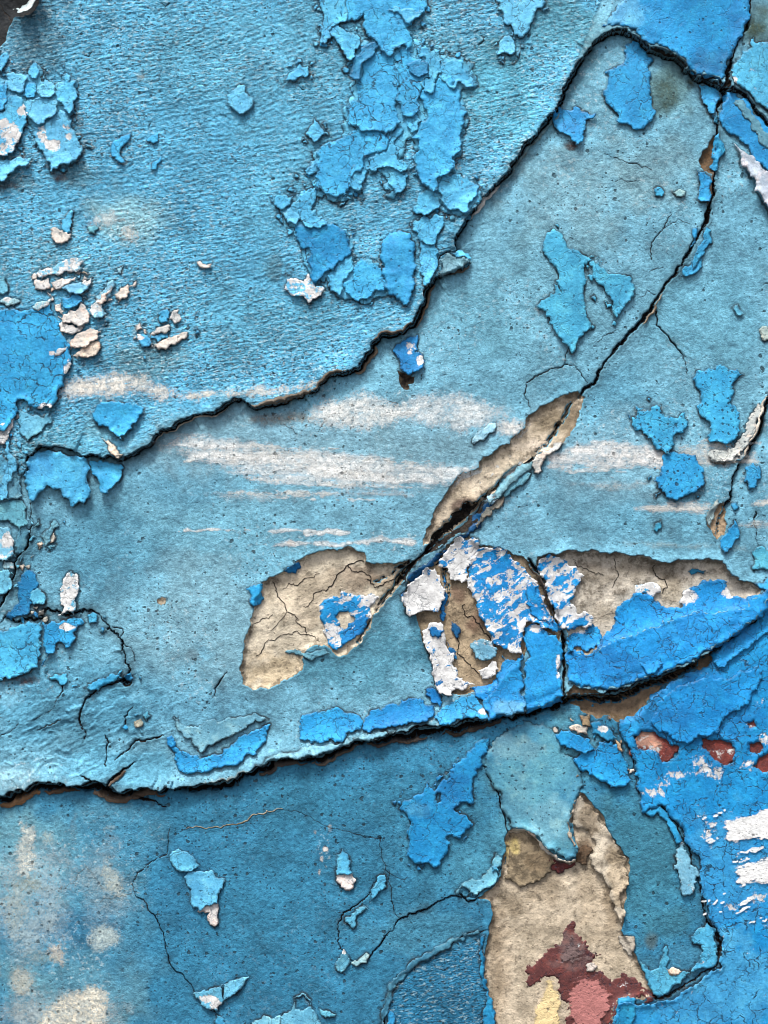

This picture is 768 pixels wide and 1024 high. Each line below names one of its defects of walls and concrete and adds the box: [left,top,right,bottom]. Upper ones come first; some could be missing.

peeling [0,0,92,182]
peeling [50,210,73,243]
peeling [110,133,131,163]
peeling [270,0,482,306]
peeling [133,309,200,359]
crack [0,0,768,808]
peeling [759,326,768,341]
peeling [167,391,768,1024]
crack [484,766,508,833]
crack [65,808,479,991]
crack [652,806,722,1000]